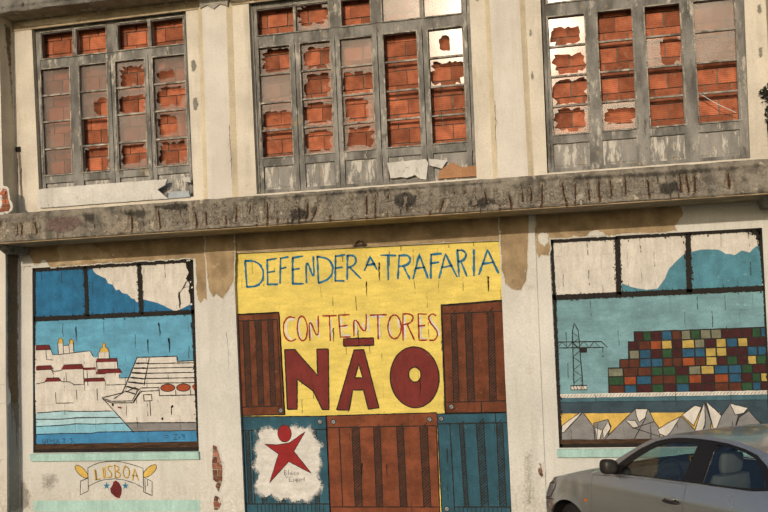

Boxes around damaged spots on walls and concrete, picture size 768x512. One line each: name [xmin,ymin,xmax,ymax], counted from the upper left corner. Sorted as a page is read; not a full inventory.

spalling [0,186,40,241]
peeling [29,173,706,305]
spalling [210,443,226,512]